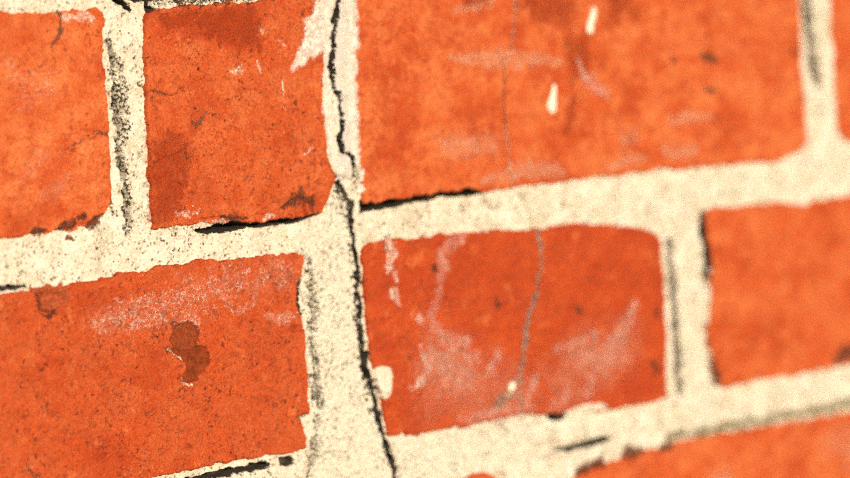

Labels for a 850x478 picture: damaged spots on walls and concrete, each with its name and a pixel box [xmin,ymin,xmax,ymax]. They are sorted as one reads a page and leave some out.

peeling [28,283,71,320]
crack [327,0,398,478]
efflorescence [383,238,400,305]
crack [500,0,544,415]
spalling [165,320,210,386]